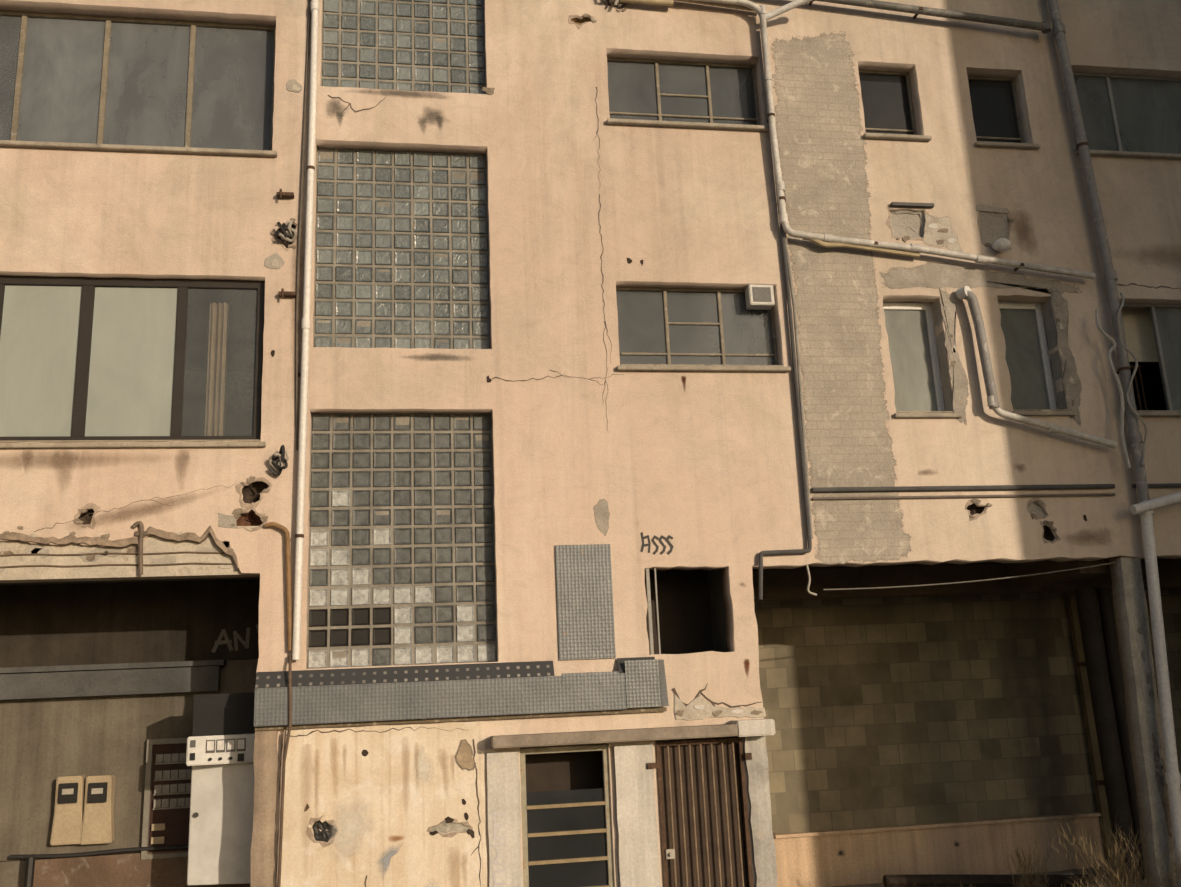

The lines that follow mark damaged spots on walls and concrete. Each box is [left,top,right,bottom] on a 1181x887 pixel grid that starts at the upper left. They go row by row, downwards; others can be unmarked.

crack [328,95,385,113]
crack [492,87,624,433]
peeling [880,210,1081,426]
spalling [0,503,233,572]
spalling [231,475,272,532]
hole [965,498,992,521]
spalling [1027,498,1061,544]
flaking render [673,694,766,721]
spalling [304,804,339,848]
spalling [427,799,475,838]